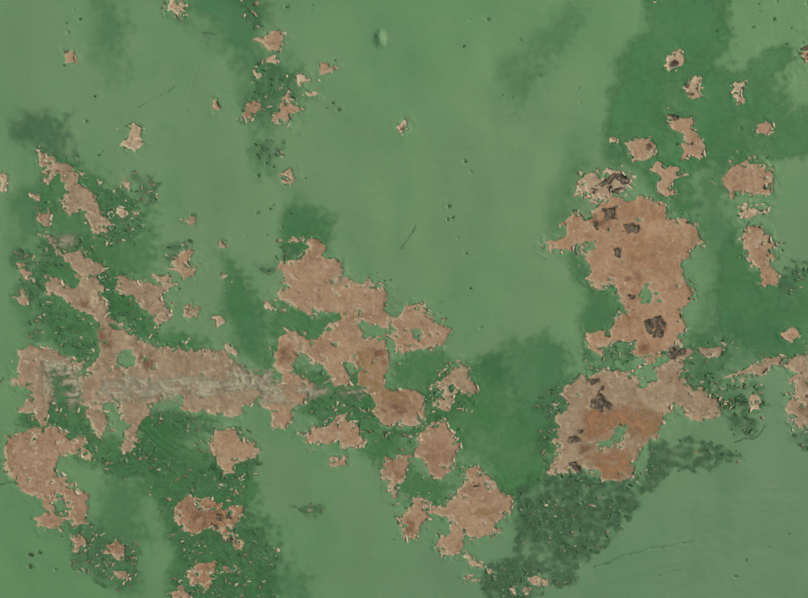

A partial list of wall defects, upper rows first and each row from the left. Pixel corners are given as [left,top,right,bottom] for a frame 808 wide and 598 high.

peeling [161,0,188,23]
damp [608,0,808,213]
spalling [114,121,151,152]
spalling [666,108,712,164]
damp [584,293,620,333]
damp [705,216,808,360]
peeling [0,131,808,598]